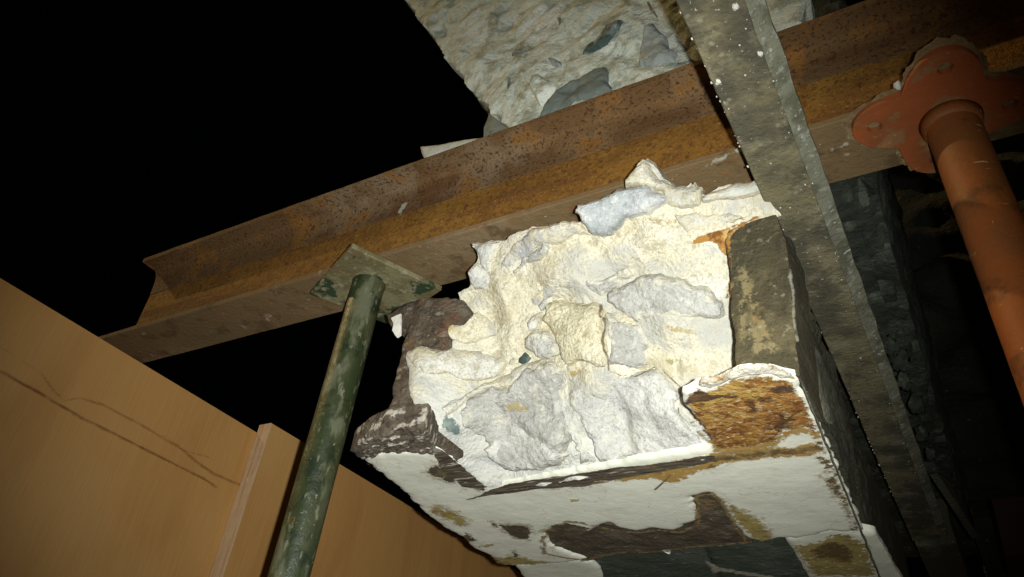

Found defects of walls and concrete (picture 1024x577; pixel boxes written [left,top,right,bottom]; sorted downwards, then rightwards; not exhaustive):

corrosion [693,216,758,268]
peeling [391,314,402,338]
peeling [350,403,460,469]
corrosion [685,376,823,468]
spalling [491,492,753,561]
corrosion [795,534,875,577]